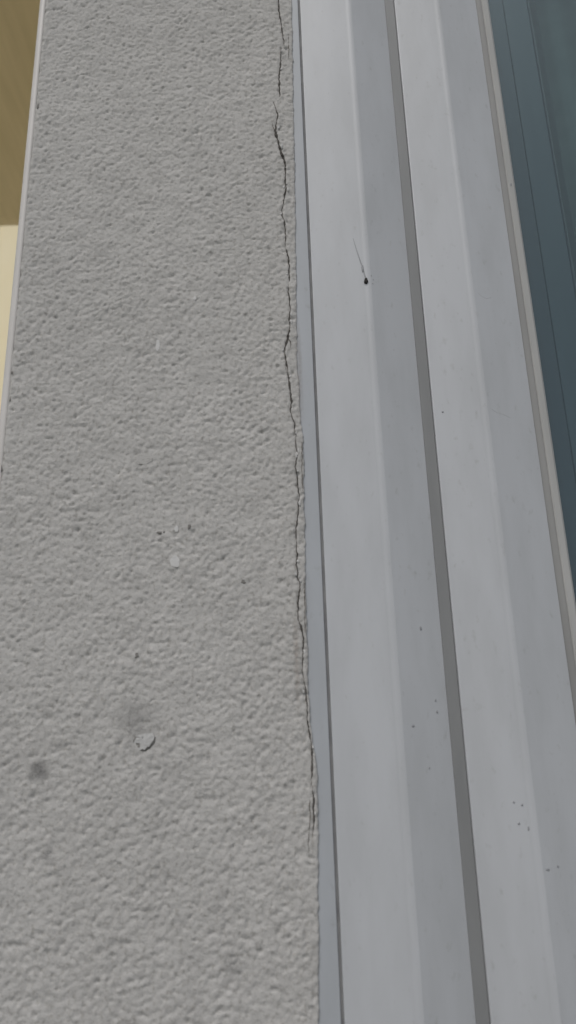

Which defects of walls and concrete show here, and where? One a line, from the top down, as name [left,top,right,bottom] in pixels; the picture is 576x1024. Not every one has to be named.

crack [272,0,316,852]